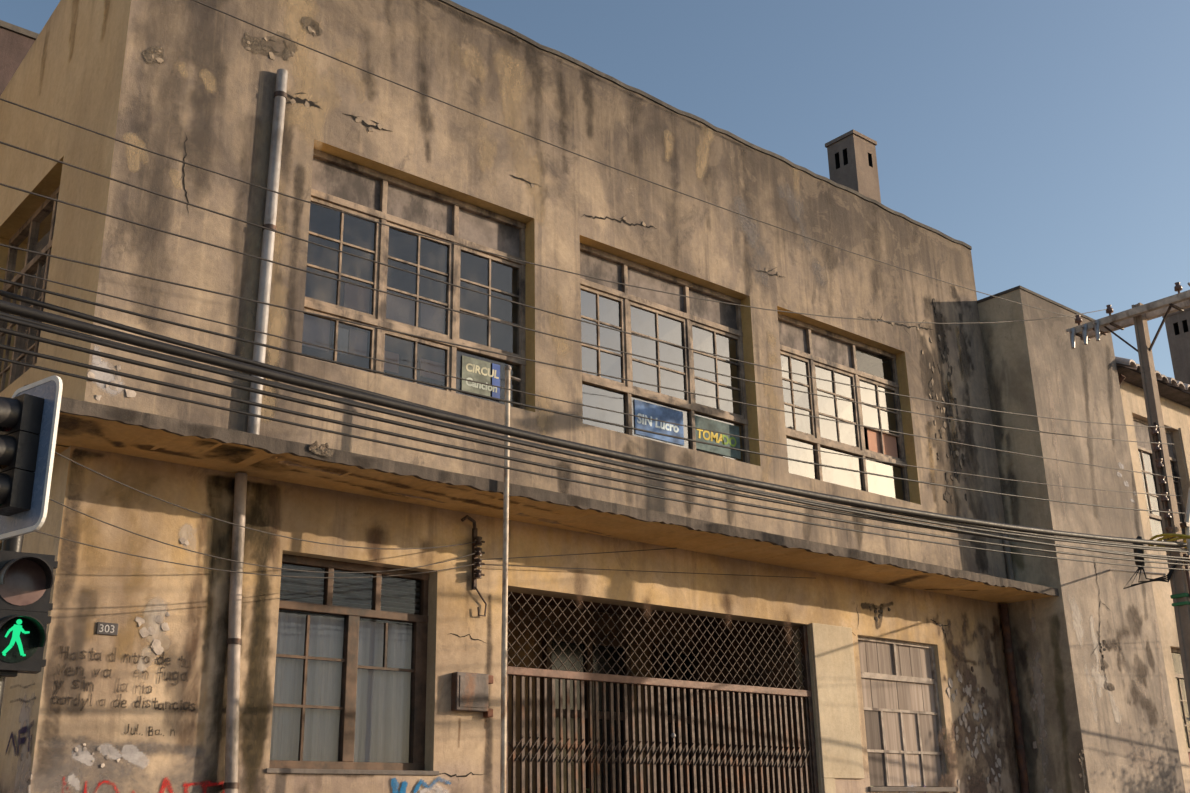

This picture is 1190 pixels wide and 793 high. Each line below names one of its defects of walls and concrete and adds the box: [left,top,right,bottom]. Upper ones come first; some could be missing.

spalling [243,33,297,61]
damp [282,4,312,158]
crack [286,92,392,132]
crack [177,134,189,214]
crack [583,214,658,229]
damp [261,230,294,421]
damp [58,415,122,447]
damp [285,457,550,522]
peeling [135,599,170,671]
damp [36,476,274,793]
peeling [933,616,1007,793]
peeling [73,743,148,768]